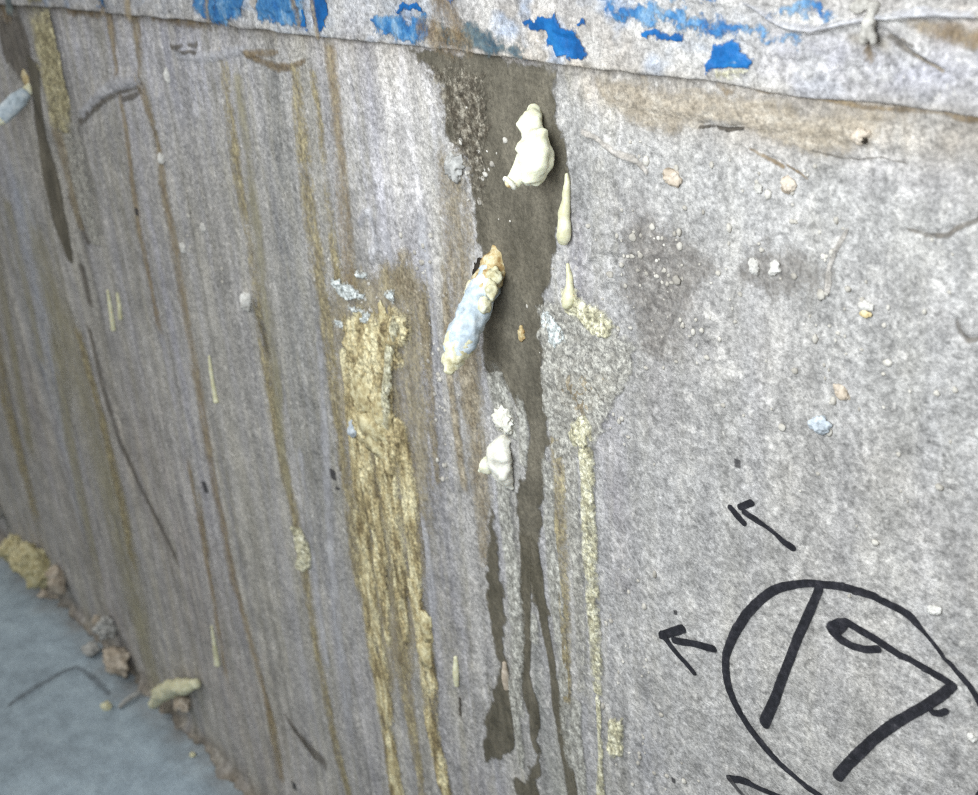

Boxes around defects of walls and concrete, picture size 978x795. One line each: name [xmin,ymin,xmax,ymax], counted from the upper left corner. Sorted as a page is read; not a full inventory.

peeling [192,0,243,26]
peeling [255,0,328,34]
peeling [370,2,522,59]
peeling [522,13,587,60]
peeling [604,0,800,78]
peeling [779,0,832,22]
leakage [0,4,73,263]
spalling [596,76,883,152]
leakage [382,48,577,795]